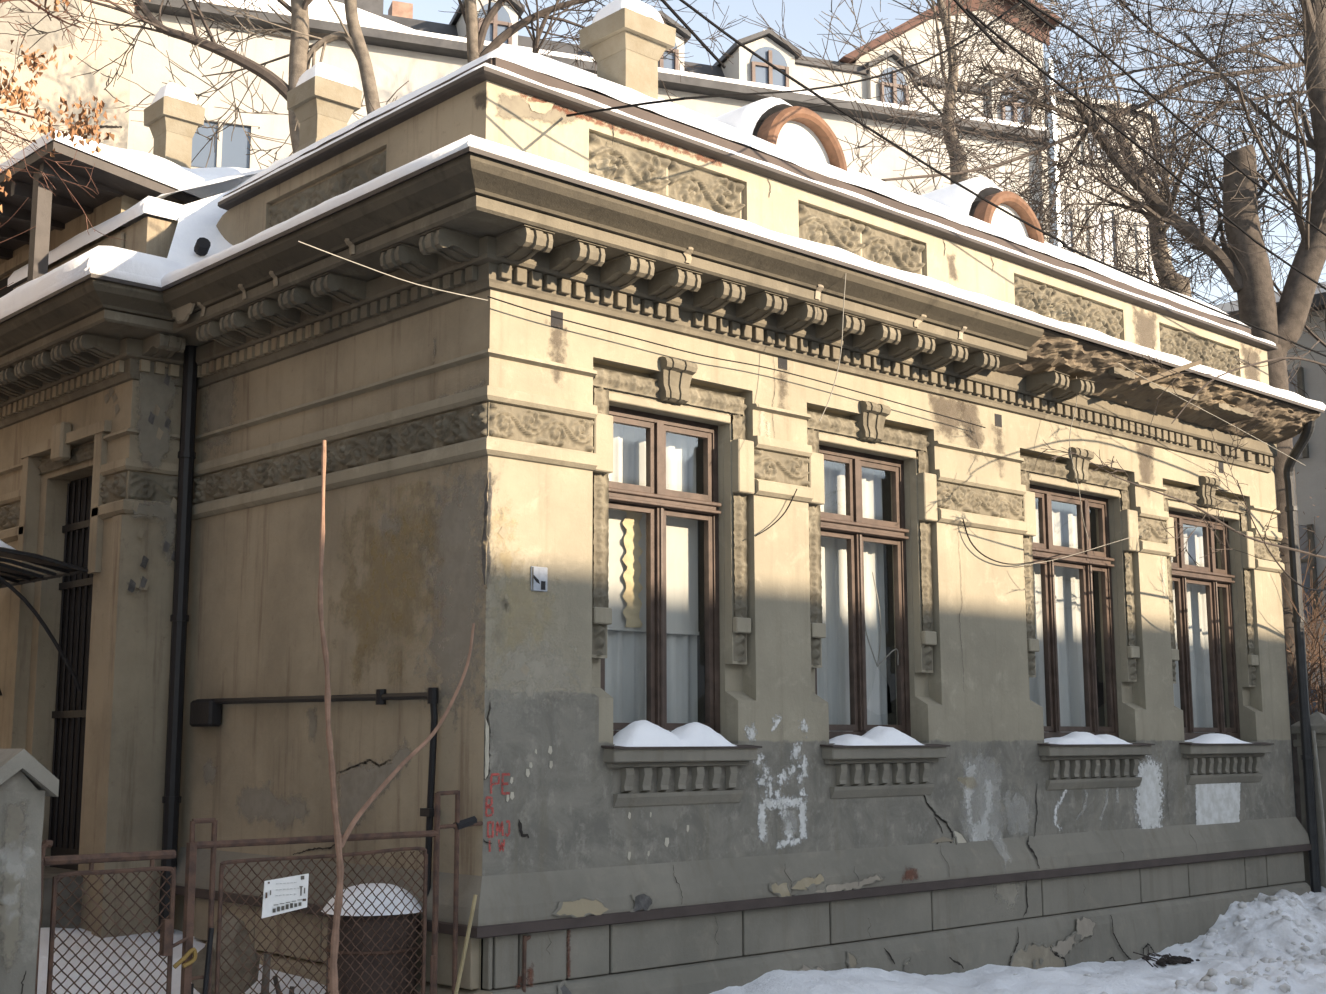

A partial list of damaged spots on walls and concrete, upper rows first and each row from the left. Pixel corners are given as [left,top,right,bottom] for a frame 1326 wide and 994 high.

leakage [342,468,502,720]
crack [337,759,391,774]
crack [293,844,335,855]
crack [923,794,968,866]
crack [994,789,1067,967]
crack [1109,915,1179,962]